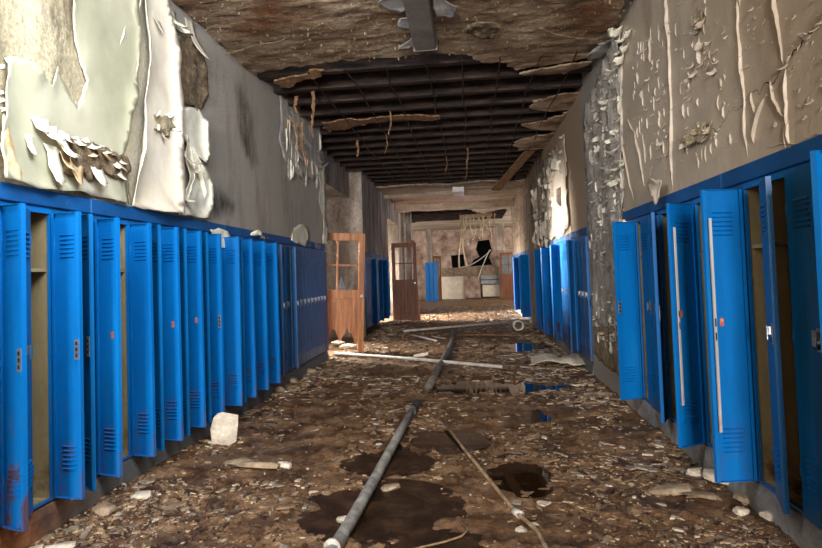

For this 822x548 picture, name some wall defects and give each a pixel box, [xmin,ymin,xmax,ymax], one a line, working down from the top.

peeling [0,0,214,218]
flaking render [279,94,331,246]
flaking render [583,0,772,375]